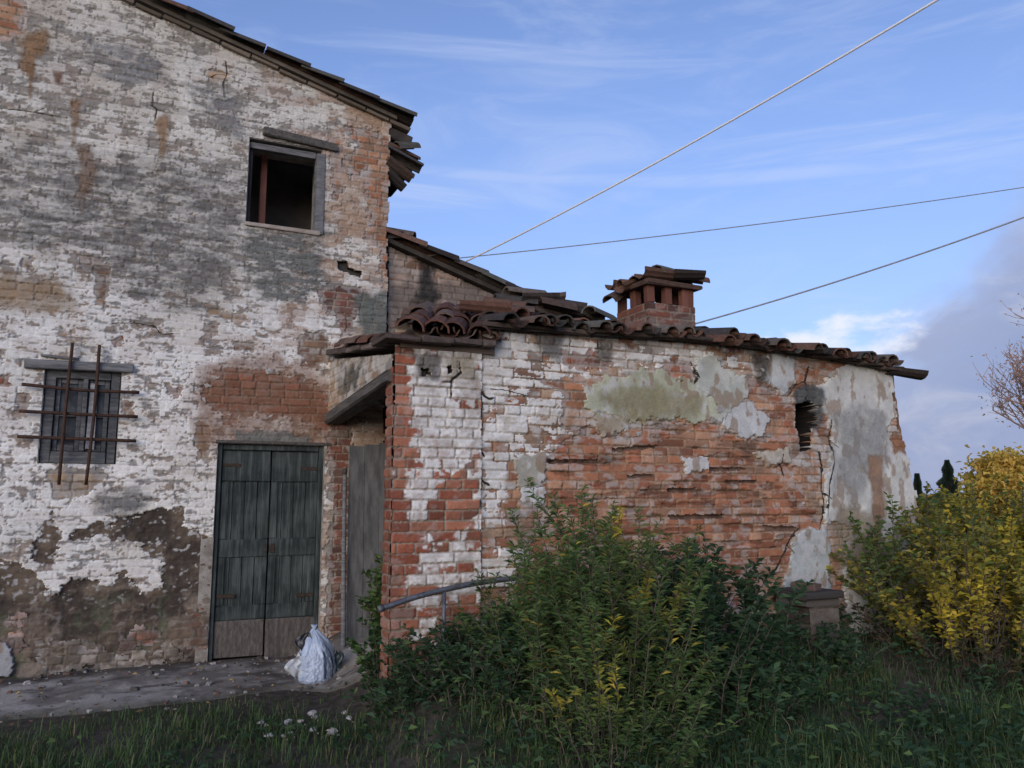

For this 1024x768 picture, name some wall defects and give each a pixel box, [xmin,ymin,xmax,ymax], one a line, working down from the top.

spalling [328,126,390,283]
flaking render [0,465,211,679]
spalling [200,260,364,638]
crack [444,362,462,396]
spalling [501,349,929,633]
crack [768,419,839,579]